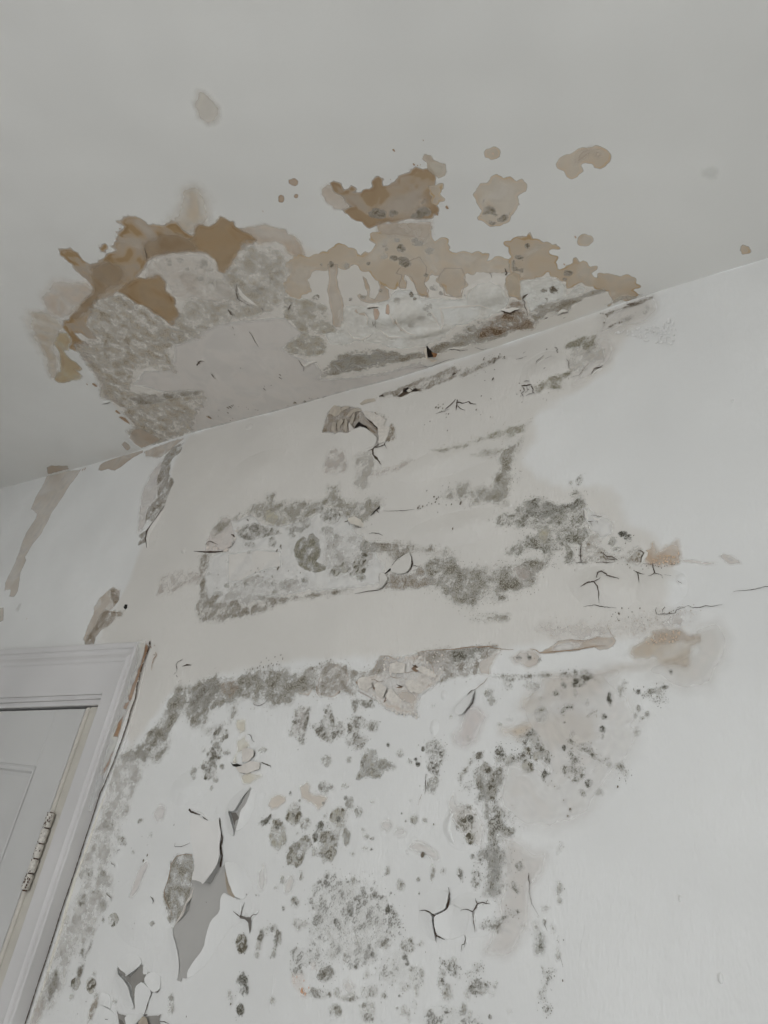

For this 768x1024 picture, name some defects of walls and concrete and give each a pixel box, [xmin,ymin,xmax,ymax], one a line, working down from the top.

water stain [484,147,500,160]
water stain [556,146,611,179]
peeling [136,318,437,464]
water stain [33,155,653,545]
crack [424,399,477,431]
water stain [158,421,642,624]
crack [576,543,768,621]
flaking render [356,650,453,719]
peeling [93,787,255,1024]
water stain [31,655,497,1024]
crack [419,887,491,950]
water stain [401,604,717,948]